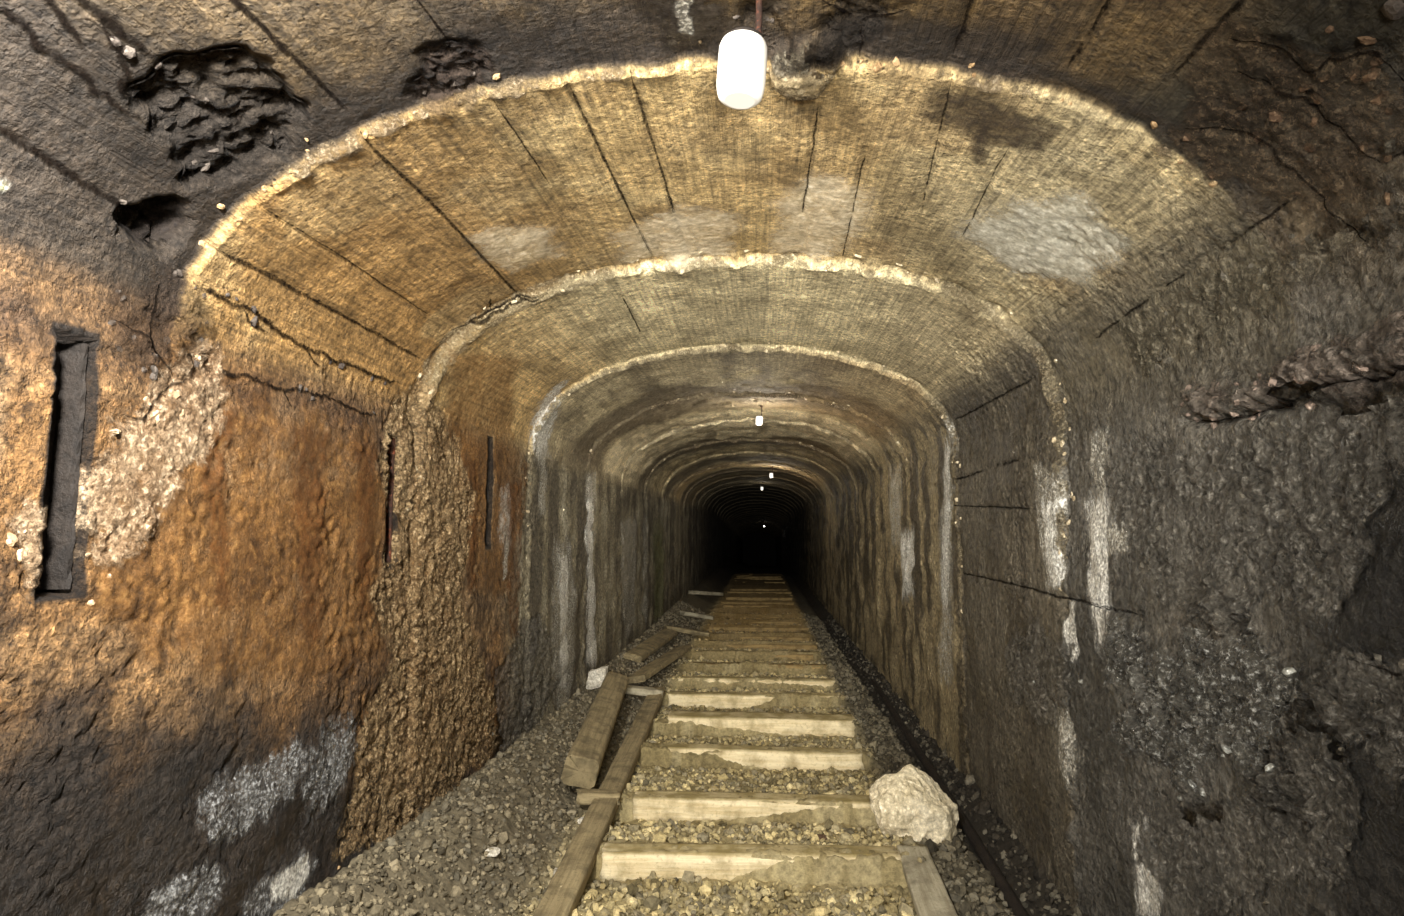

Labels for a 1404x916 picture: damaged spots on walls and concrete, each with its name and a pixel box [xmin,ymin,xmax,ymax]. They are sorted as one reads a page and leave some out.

spalling [129,40,538,183]
spalling [583,63,625,81]
spalling [766,0,906,88]
spalling [965,63,1002,94]
spalling [1381,0,1404,20]
crack [1383,139,1404,157]
crack [193,247,419,416]
peeling [75,269,228,579]
spalling [1104,310,1404,633]
damp [199,713,358,840]
damp [143,867,223,916]
damp [244,851,316,916]